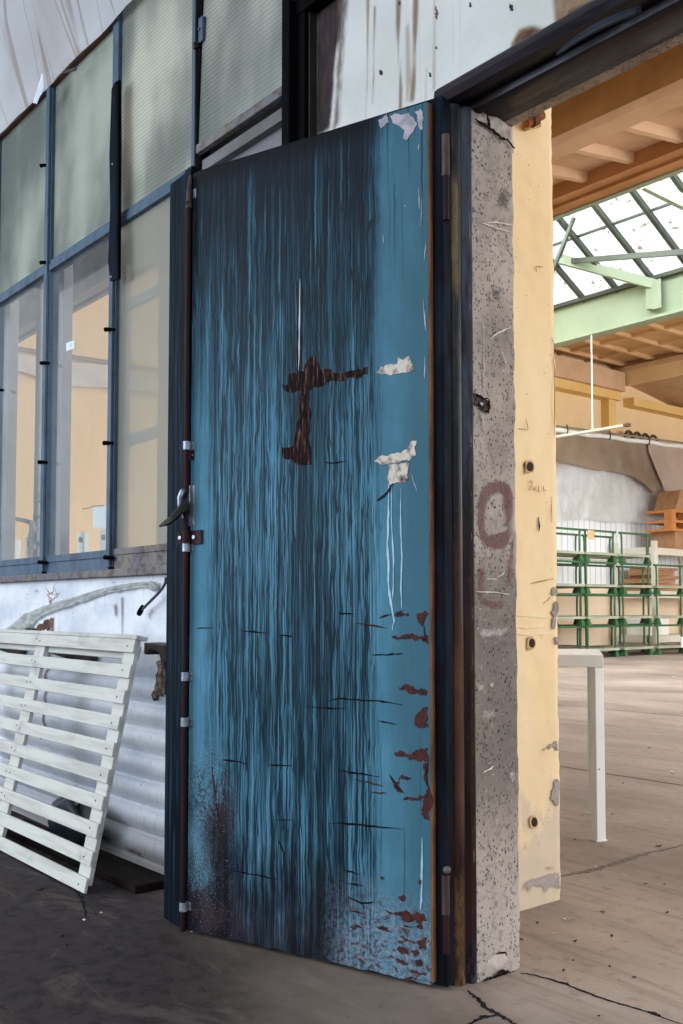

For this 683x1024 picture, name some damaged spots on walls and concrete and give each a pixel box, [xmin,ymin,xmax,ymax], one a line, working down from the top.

damp [317,0,347,133]
damp [399,69,415,107]
peeling [378,109,424,150]
peeling [281,356,425,465]
peeling [375,441,417,490]
rust [392,610,428,644]
rust [398,684,428,728]
rust [389,748,434,820]
crack [561,844,683,876]
rust [386,895,427,981]
crack [467,990,517,1024]
crack [521,973,681,1024]